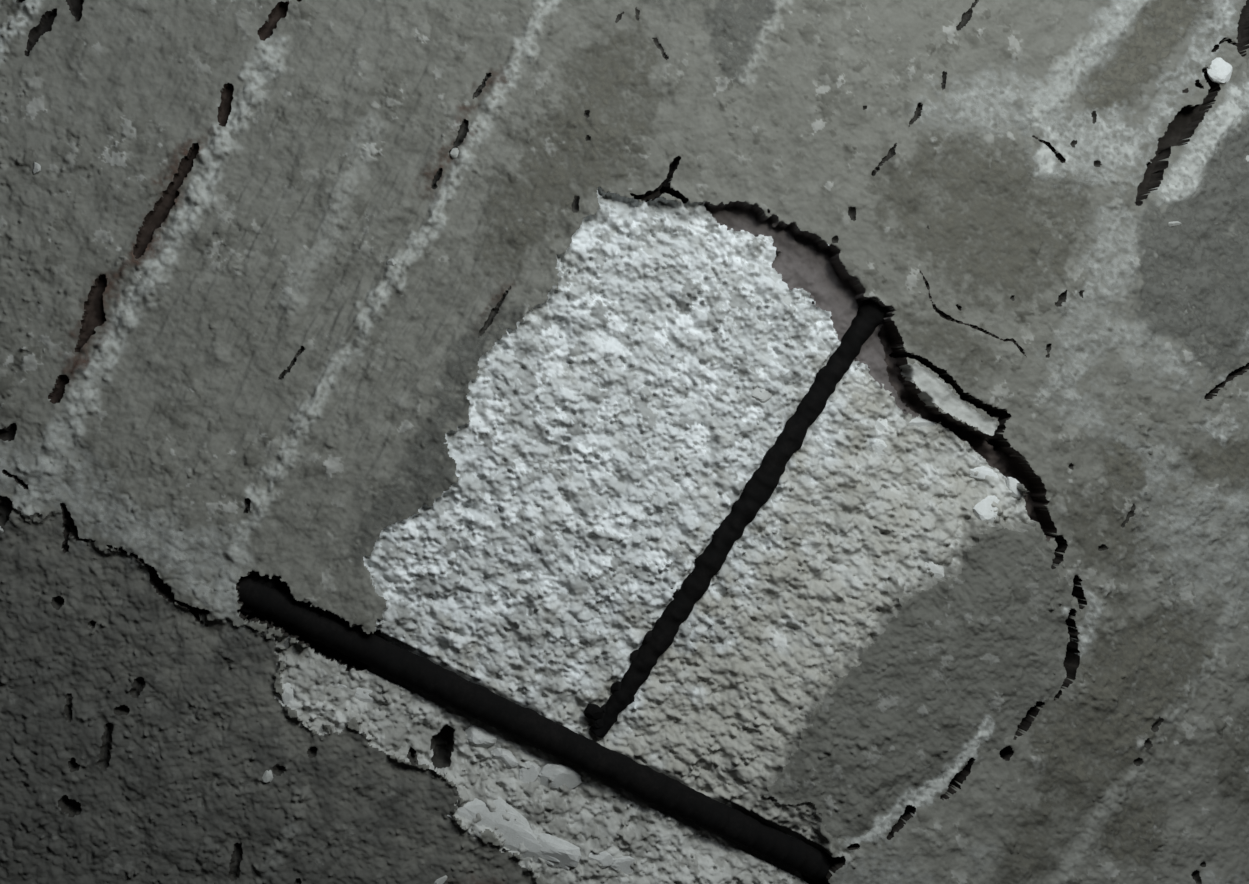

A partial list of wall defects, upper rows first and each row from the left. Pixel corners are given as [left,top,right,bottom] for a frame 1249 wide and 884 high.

crack [431,73,492,189]
water stain [483,26,659,273]
crack [630,156,689,204]
spalling [652,38,669,60]
crack [1135,0,1249,206]
crack [919,270,1027,357]
spalling [1055,290,1084,307]
water stain [351,304,525,560]
water stain [0,452,238,616]
crack [60,503,210,627]
spalling [0,187,1036,884]
crack [802,320,1087,884]